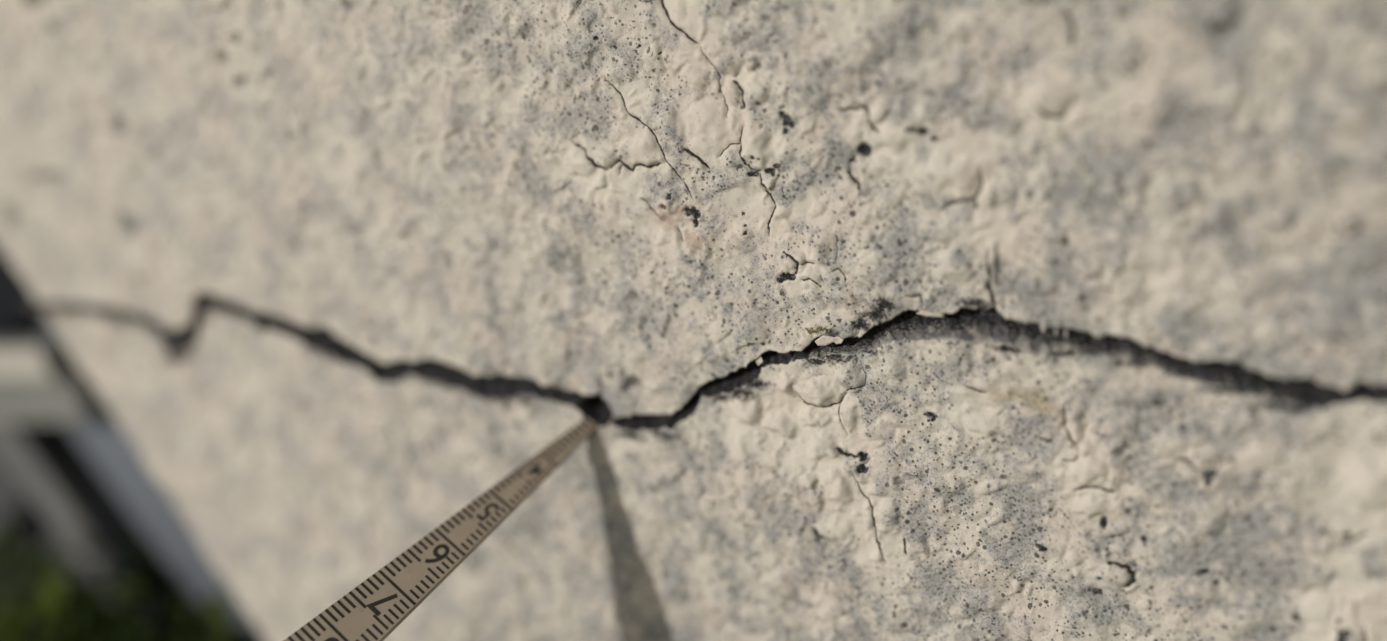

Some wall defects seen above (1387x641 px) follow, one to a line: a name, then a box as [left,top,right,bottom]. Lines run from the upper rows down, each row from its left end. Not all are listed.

crack [1063,10,1076,45]
crack [568,0,784,235]
crack [838,105,880,192]
crack [944,169,984,209]
crack [24,235,1387,563]